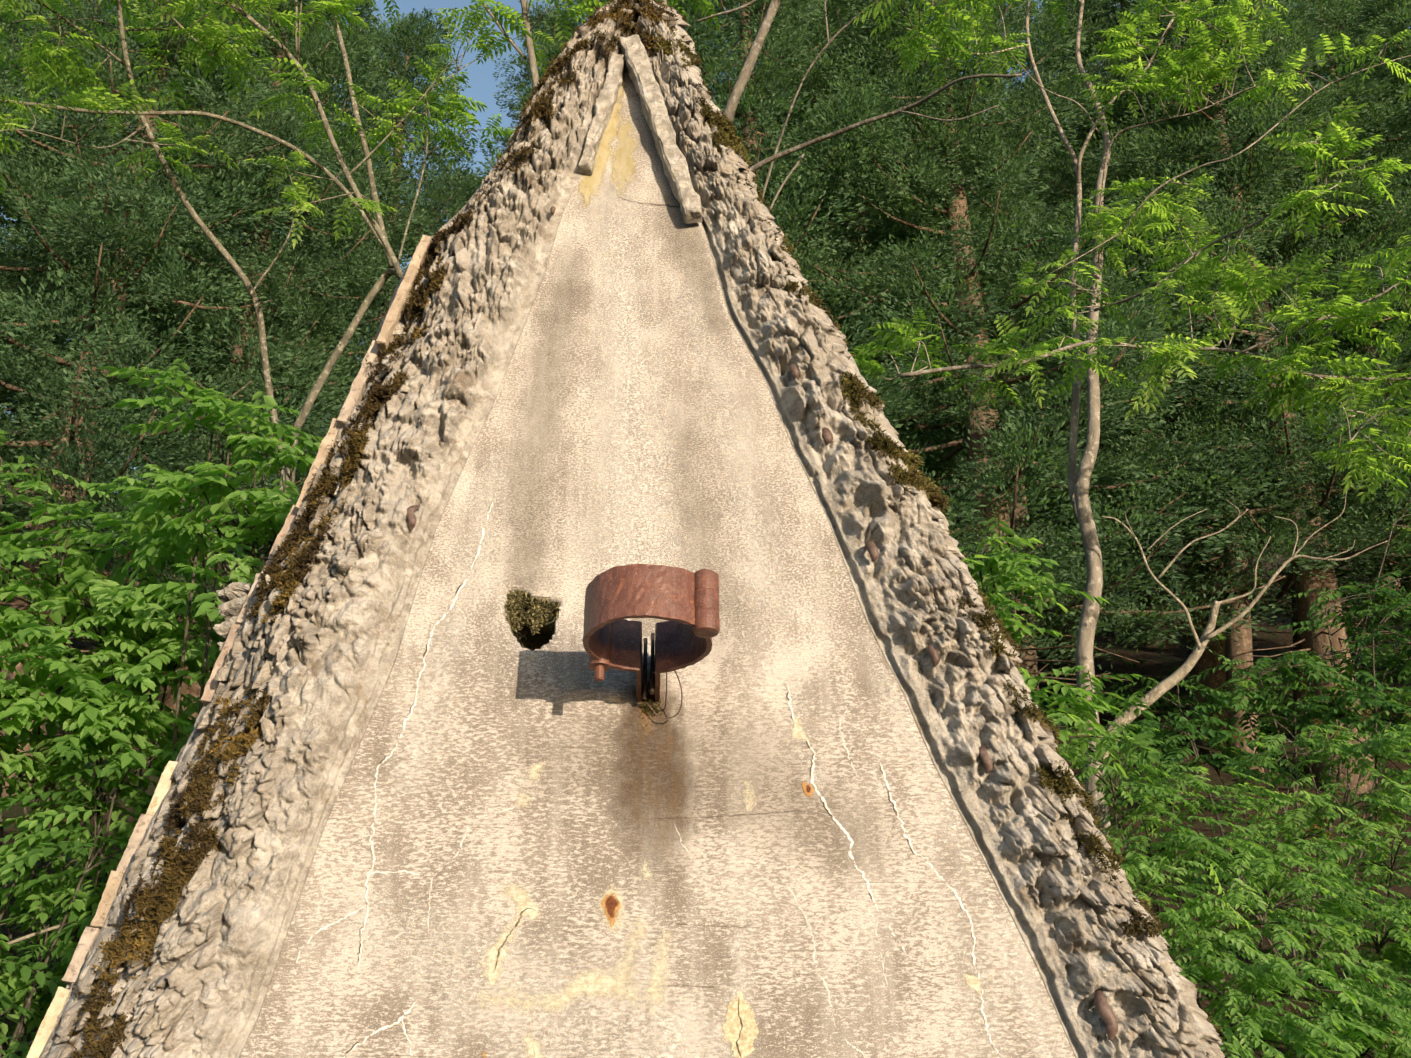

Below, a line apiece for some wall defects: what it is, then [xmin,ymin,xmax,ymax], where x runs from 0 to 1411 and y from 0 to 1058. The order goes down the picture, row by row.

damp [578,81,675,572]
spalling [494,578,569,661]
crack [296,502,518,969]
damp [619,682,687,837]
corrosion [802,782,814,796]
peeling [482,885,539,985]
corrosion [600,887,623,930]
crack [780,685,998,1058]
peeling [722,990,759,1058]